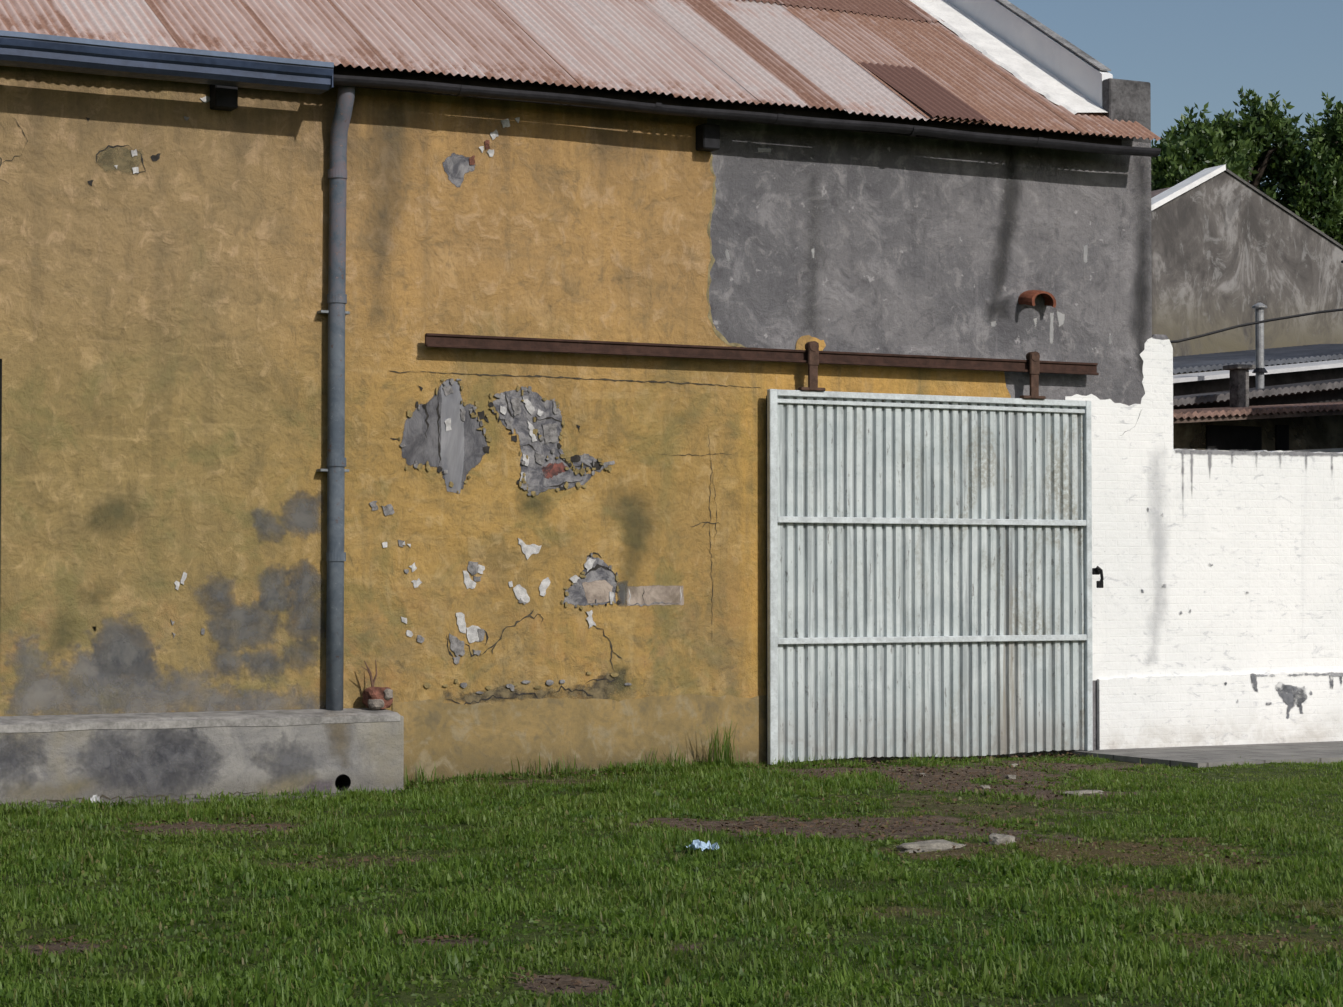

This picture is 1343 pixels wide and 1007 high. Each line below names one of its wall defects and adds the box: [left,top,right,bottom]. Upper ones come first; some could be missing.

spalling [87,145,161,186]
spalling [443,117,520,187]
spalling [390,378,615,497]
leakage [253,494,321,537]
peeling [518,538,542,560]
leakage [14,622,322,716]
leakage [200,563,326,674]
crack [480,610,544,656]
spalling [423,612,632,704]
spalling [508,552,621,628]
crack [596,627,623,671]
leakage [81,733,215,793]